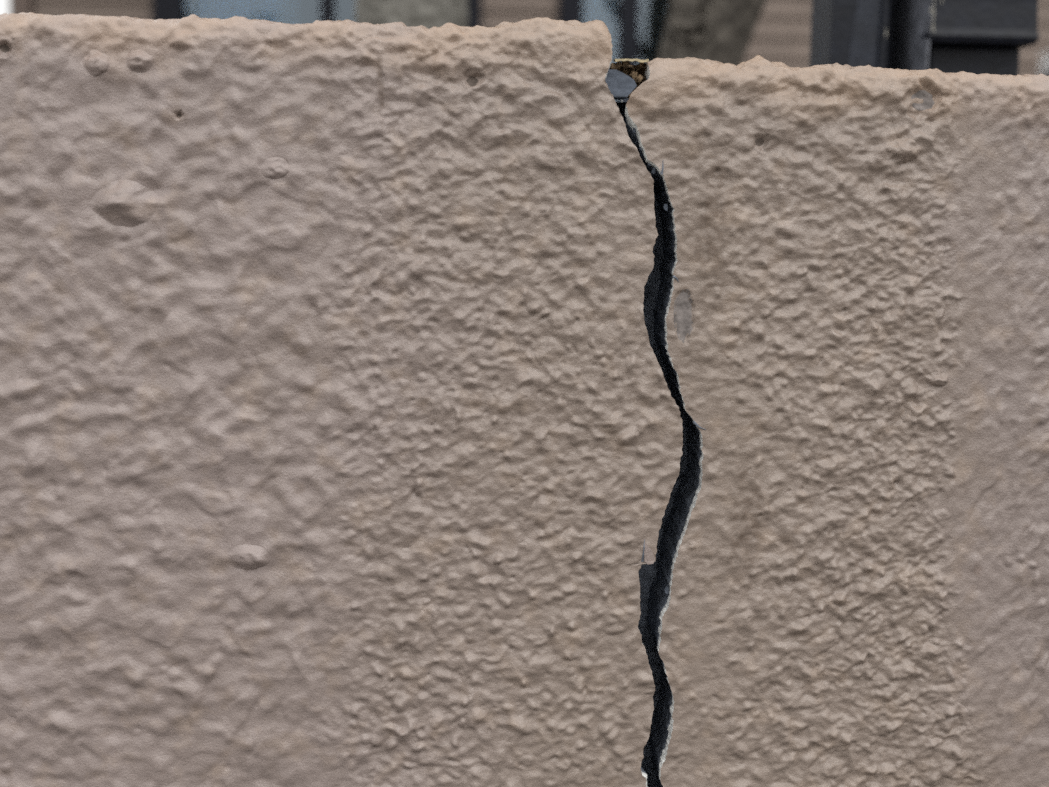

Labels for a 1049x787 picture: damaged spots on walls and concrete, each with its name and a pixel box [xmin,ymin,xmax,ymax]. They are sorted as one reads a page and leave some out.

crack [605,60,706,787]